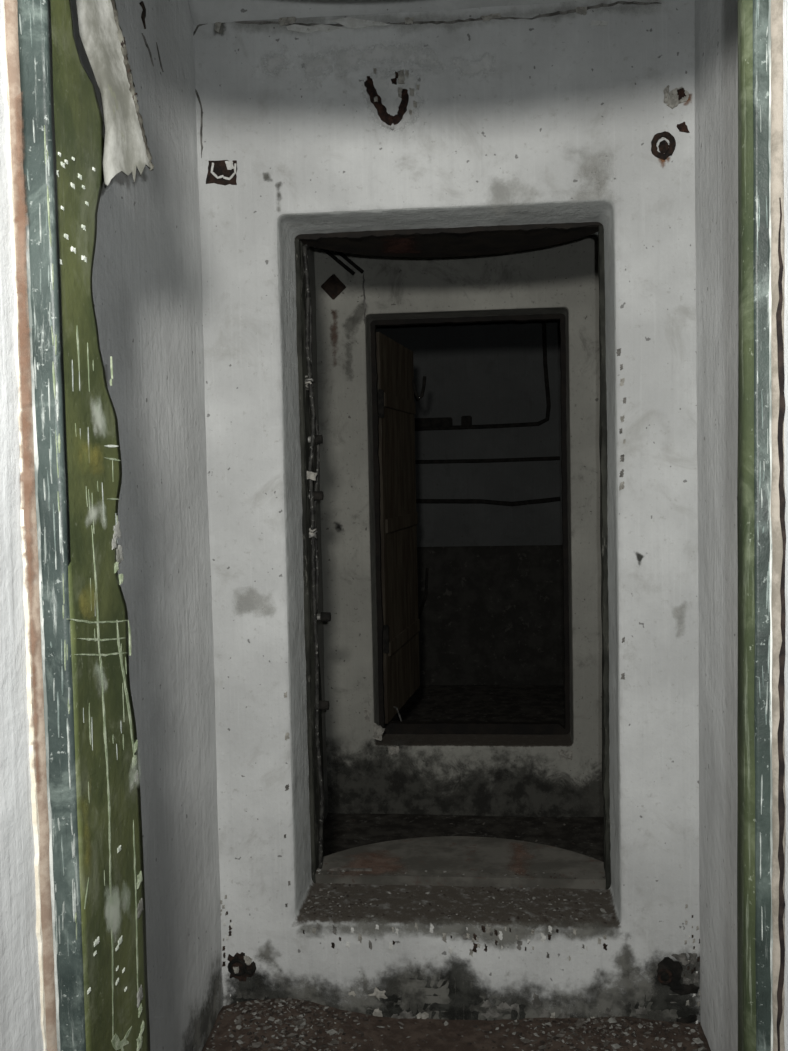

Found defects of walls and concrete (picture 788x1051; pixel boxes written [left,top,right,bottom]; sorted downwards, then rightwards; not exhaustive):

crack [193,1,662,36]
peeling [76,0,154,188]
crack [195,89,203,158]
spalling [663,85,691,109]
water stain [326,741,585,817]
peeling [220,895,252,974]
water stain [185,945,700,1051]